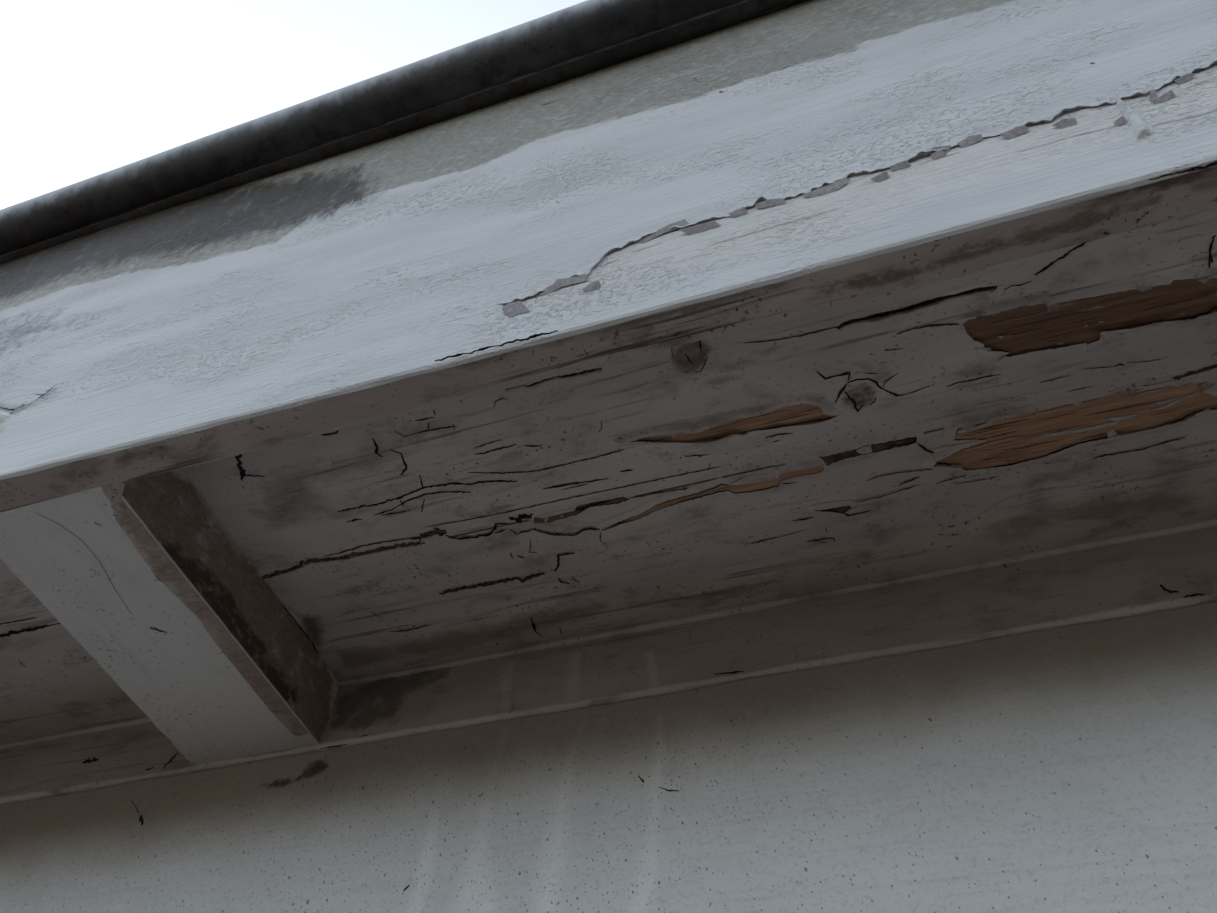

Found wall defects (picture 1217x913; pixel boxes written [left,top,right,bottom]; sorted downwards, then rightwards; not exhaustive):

peeling [498,57,1217,318]
crack [435,330,558,362]
crack [747,234,1117,413]
peeling [898,235,1217,364]
crack [235,454,264,480]
water stain [245,409,489,550]
crack [258,400,743,654]
peeling [529,373,1217,547]
water stain [958,469,1217,551]
crack [0,617,48,667]
water stain [101,469,629,913]
water stain [618,711,671,913]